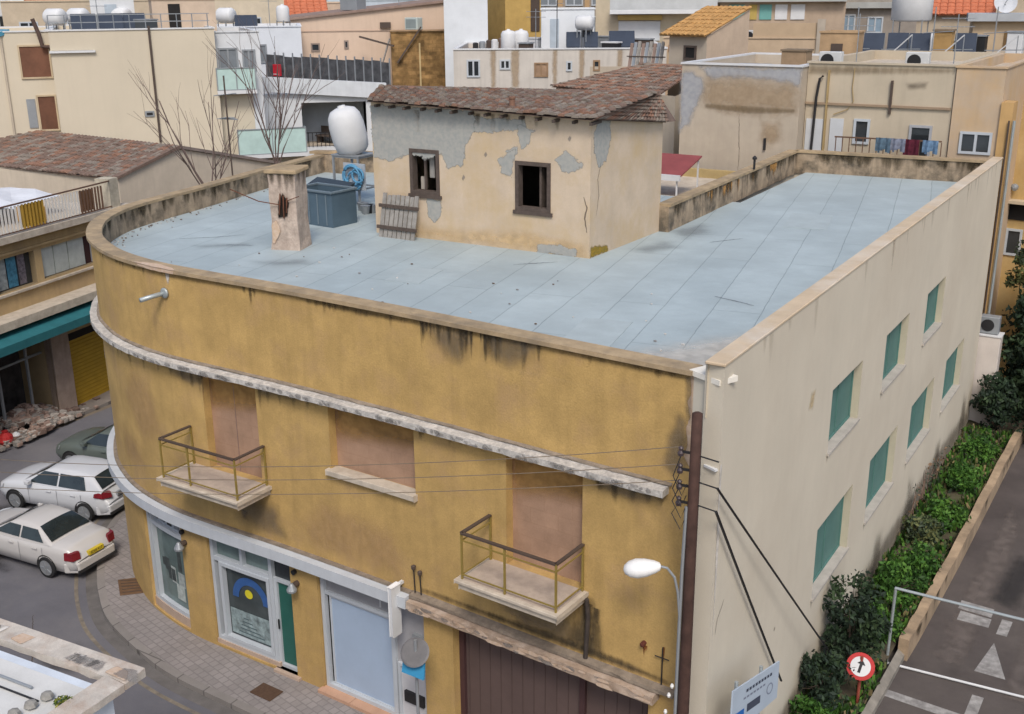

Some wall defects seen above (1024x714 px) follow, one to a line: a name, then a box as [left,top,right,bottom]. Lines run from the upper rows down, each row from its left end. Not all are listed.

peeling [370,105,535,176]
peeling [555,150,583,173]
peeling [593,120,611,167]
damp [675,153,797,211]
peeling [427,199,442,223]
damp [420,321,540,357]
damp [867,407,966,581]